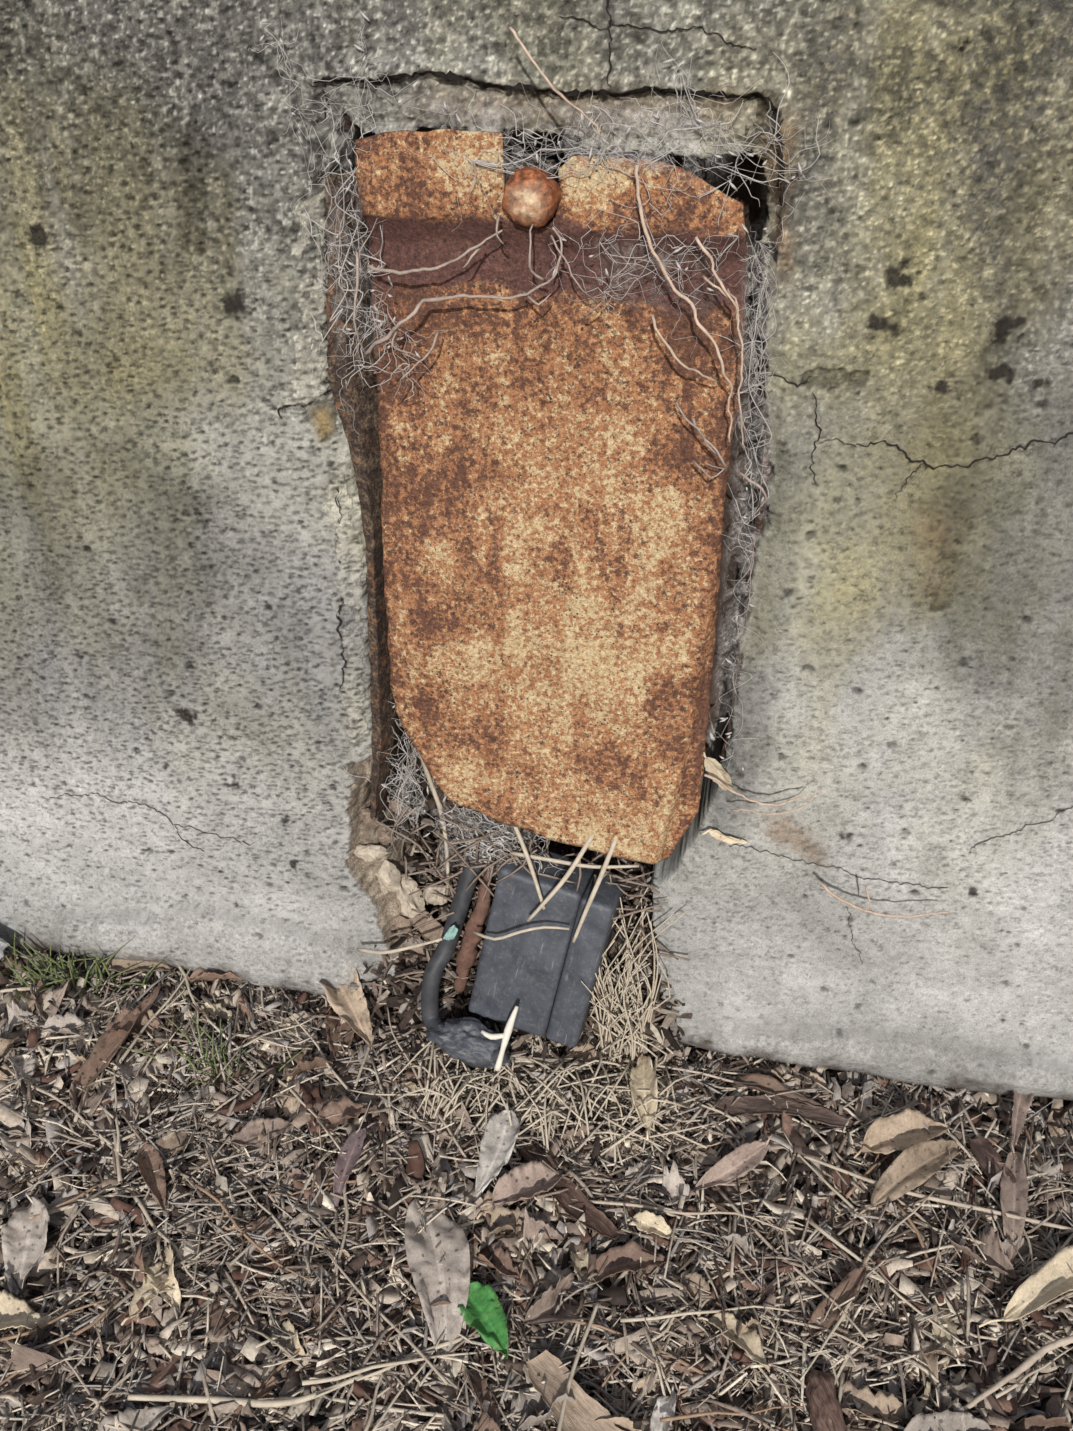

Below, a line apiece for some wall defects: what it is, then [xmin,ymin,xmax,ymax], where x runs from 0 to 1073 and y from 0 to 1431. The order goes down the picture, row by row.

crack [309,0,787,202]
crack [768,374,1073,499]
crack [969,806,1073,853]